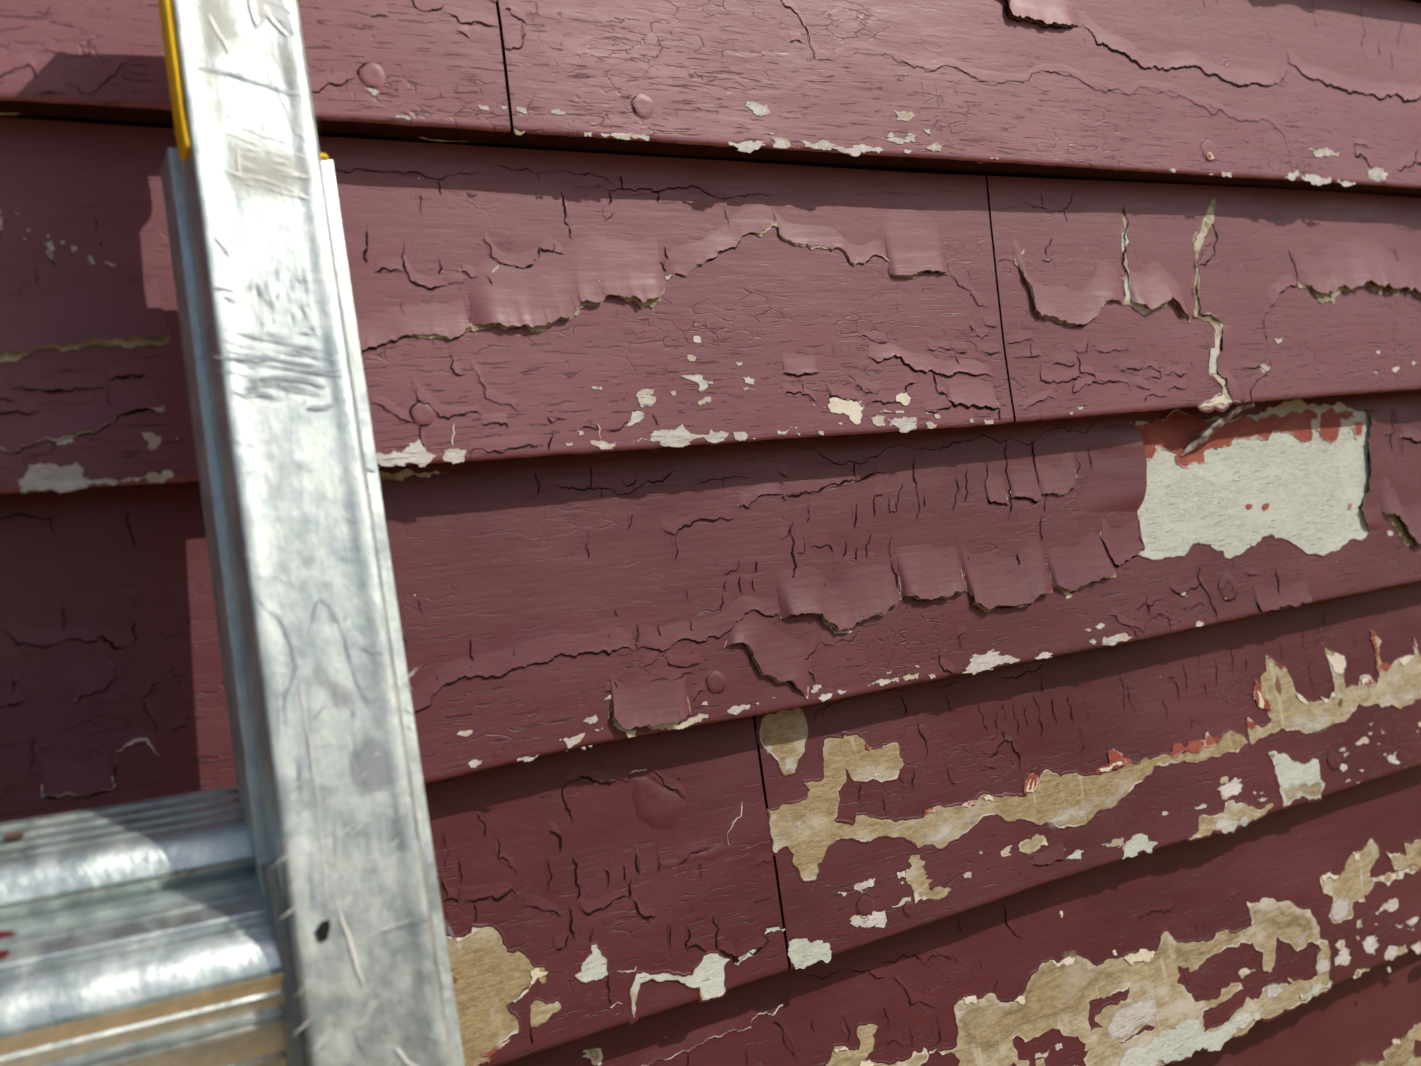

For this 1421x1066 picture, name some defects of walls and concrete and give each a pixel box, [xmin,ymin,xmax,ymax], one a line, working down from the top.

crack [782,0,1293,267]
spalling [142,432,161,450]
spalling [18,462,174,493]
peeling [411,325,1421,928]
peeling [445,923,564,1066]
spalling [572,942,610,985]
spalling [627,949,755,1024]
spalling [765,927,832,969]
peeling [819,834,1421,1066]
spalling [582,1048,603,1066]
peeling [630,996,783,1066]